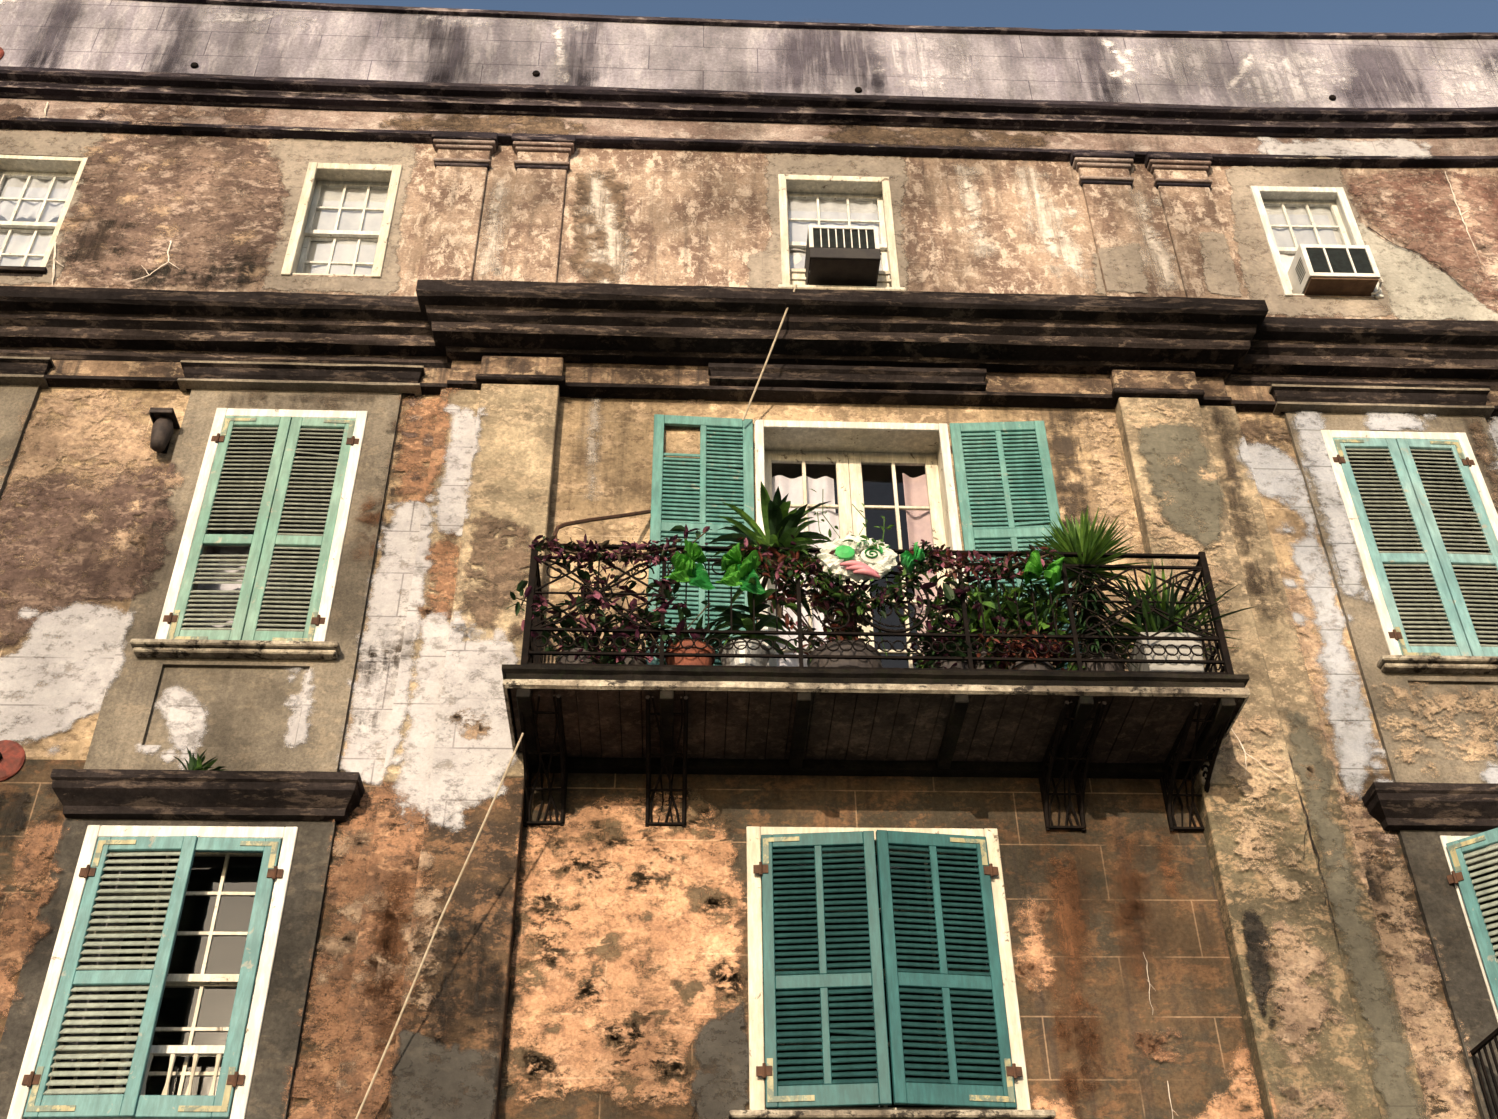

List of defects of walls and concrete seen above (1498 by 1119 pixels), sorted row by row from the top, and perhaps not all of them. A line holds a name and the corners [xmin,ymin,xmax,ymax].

leakage [30,0,80,64]
leakage [163,6,315,72]
leakage [413,15,493,83]
leakage [781,28,980,91]
leakage [1082,38,1118,99]
leakage [1240,46,1498,108]
flaking render [1346,142,1498,313]
flaking render [388,388,486,512]
flaking render [418,510,532,643]
peeling [137,743,176,762]
flaking render [452,710,490,740]
flaking render [1220,565,1498,1119]